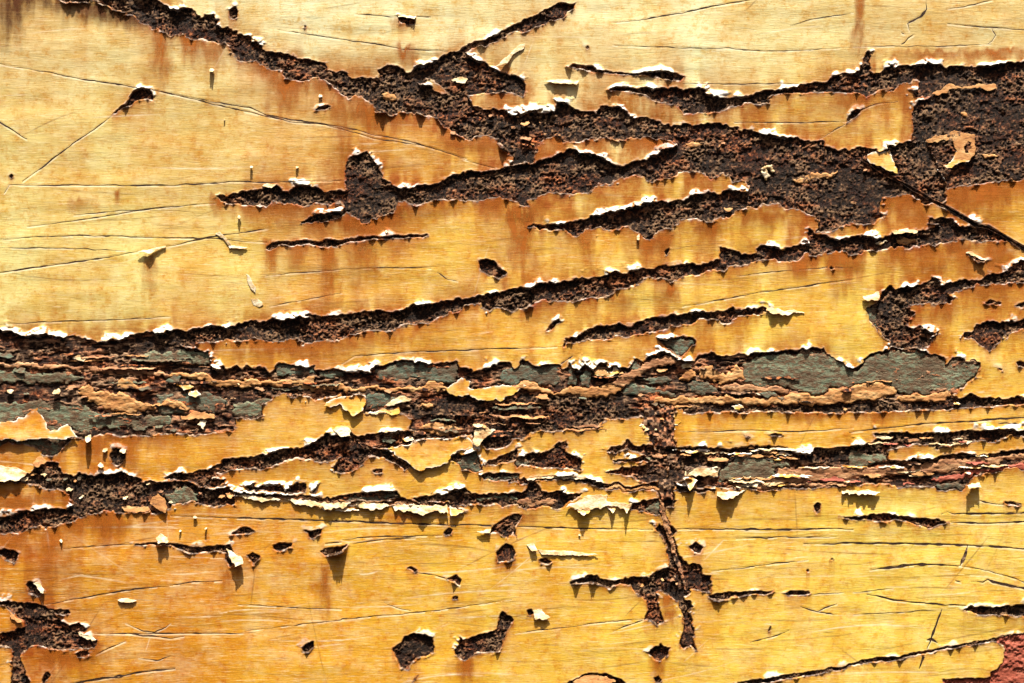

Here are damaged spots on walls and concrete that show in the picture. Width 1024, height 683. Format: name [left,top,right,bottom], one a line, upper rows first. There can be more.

corrosion [614,48,1024,207]
peeling [97,0,1024,347]
corrosion [485,198,543,268]
corrosion [385,392,639,449]
peeling [0,260,1024,649]
corrosion [675,394,1024,470]
corrosion [0,457,235,561]
crack [171,515,492,527]
crack [517,523,618,531]
crack [682,512,1024,668]
peeling [393,633,434,669]
peeling [455,612,513,660]